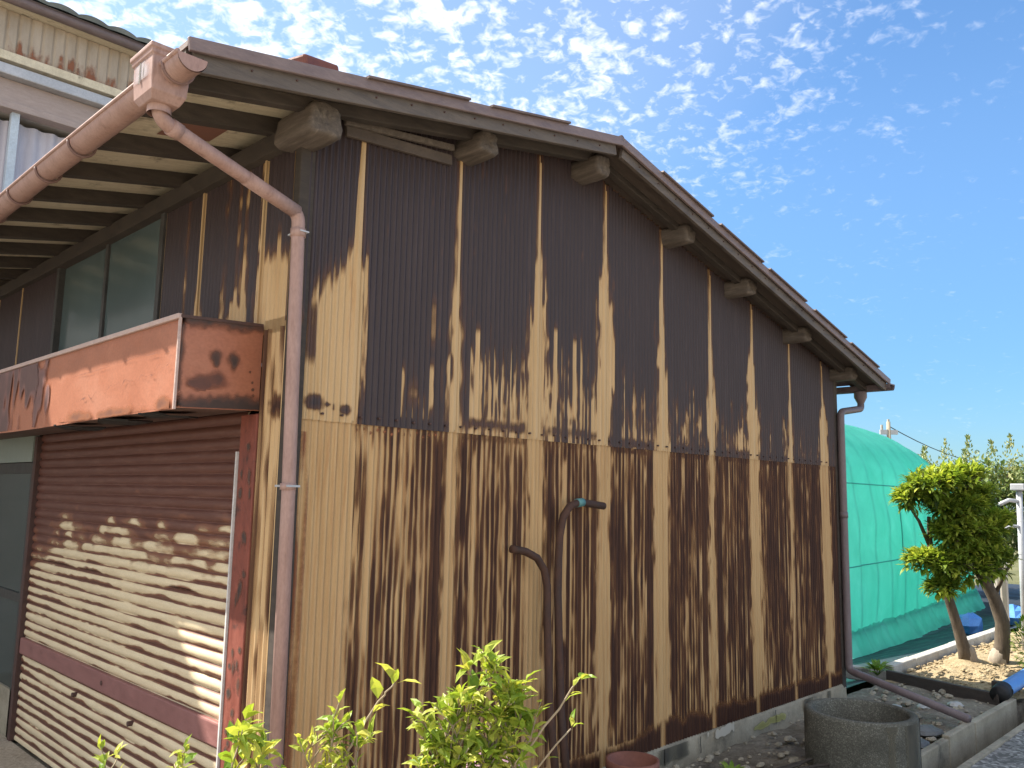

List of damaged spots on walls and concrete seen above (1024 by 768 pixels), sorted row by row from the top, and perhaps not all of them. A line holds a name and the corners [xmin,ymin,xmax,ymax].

rust [0,271,57,370]
rust [15,179,292,768]
rust [250,120,842,768]